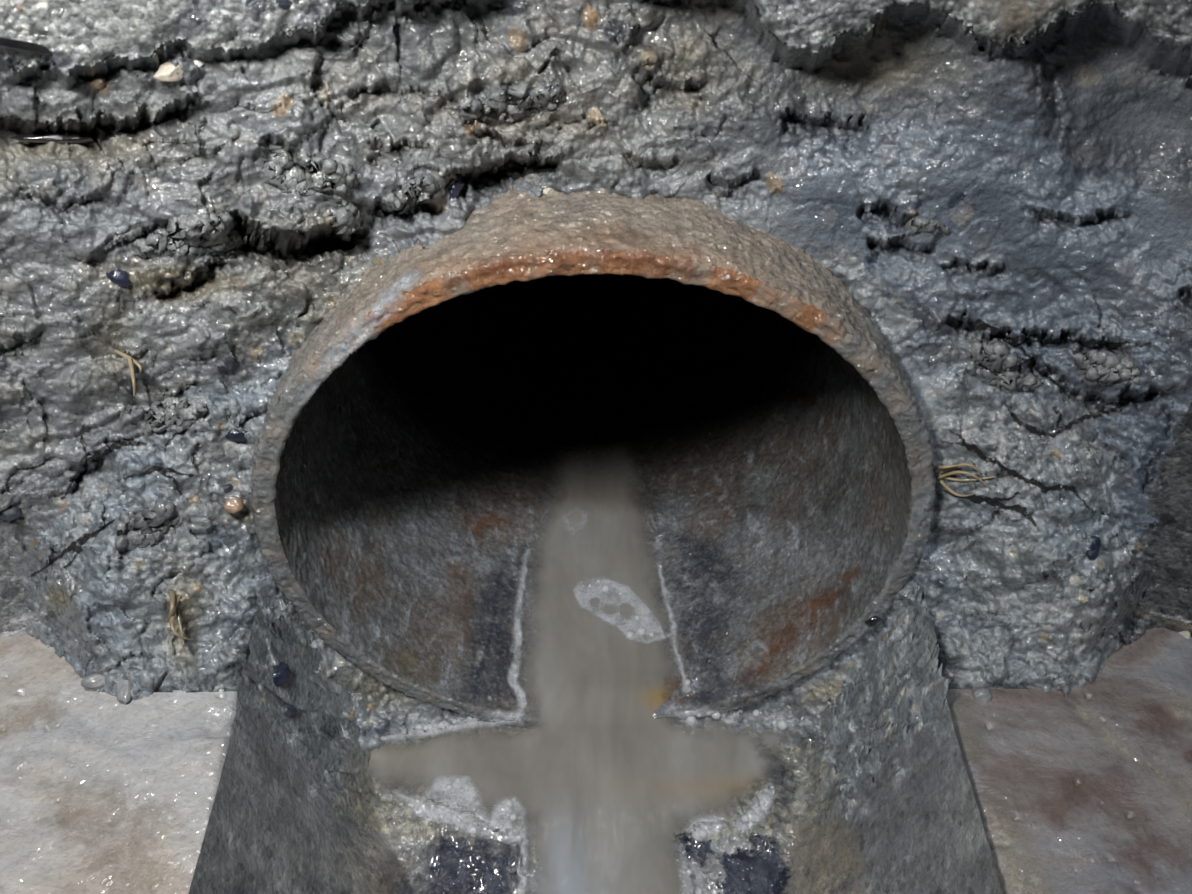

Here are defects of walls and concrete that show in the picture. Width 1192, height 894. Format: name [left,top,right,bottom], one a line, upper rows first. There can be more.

rust [443,255,536,290]
spalling [0,0,1192,611]
crack [943,316,1175,438]
crack [935,430,1090,530]
leakage [468,577,517,699]
leakage [678,538,730,665]
leakage [674,832,714,868]